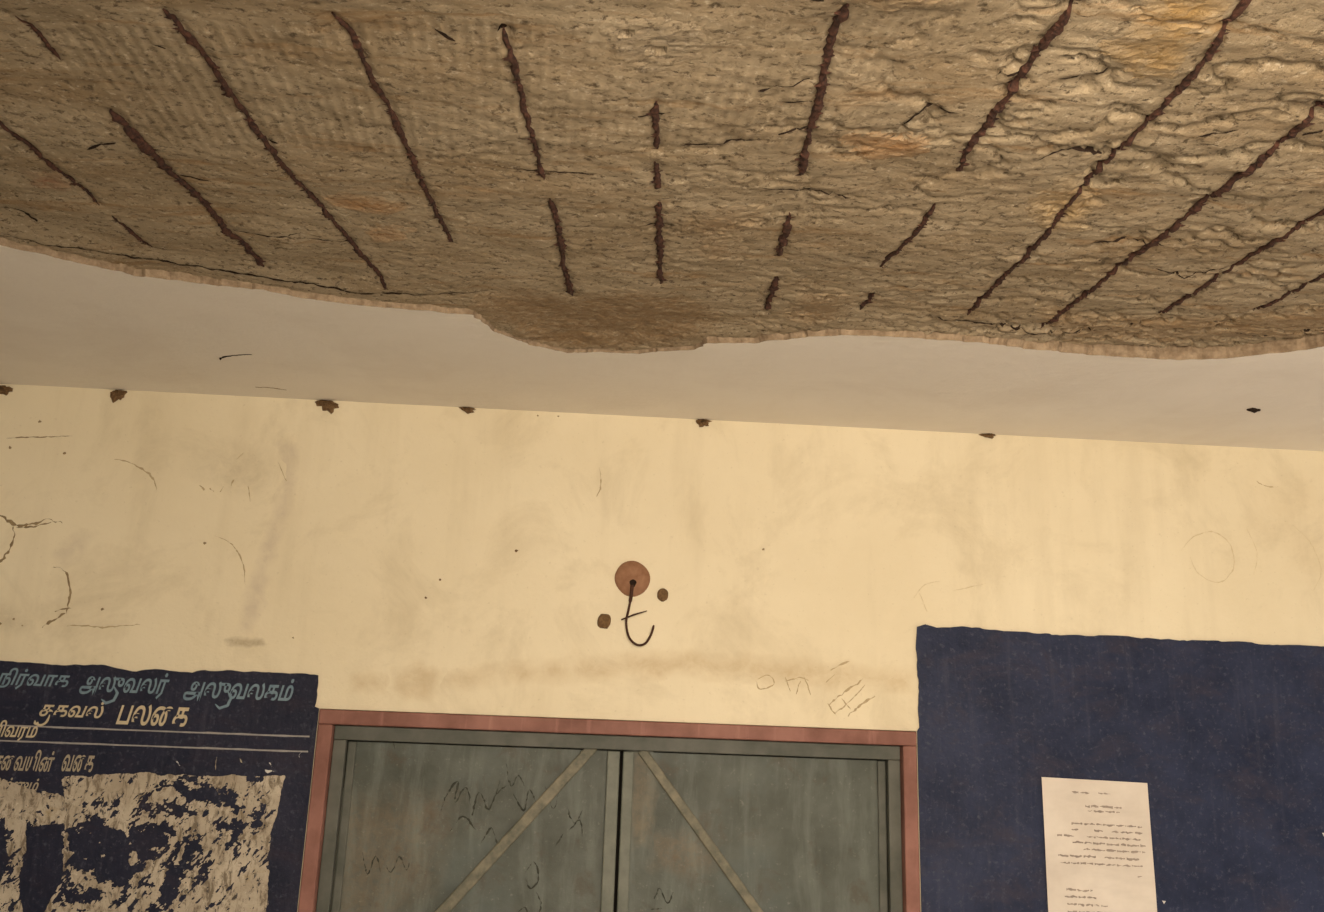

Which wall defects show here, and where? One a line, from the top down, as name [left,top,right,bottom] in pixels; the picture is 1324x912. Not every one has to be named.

spalling [0,0,1324,351]